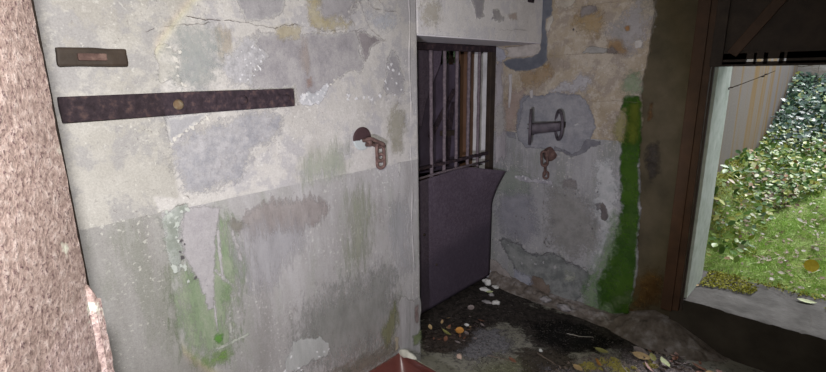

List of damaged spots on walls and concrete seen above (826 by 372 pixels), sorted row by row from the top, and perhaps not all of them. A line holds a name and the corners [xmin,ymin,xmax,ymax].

peeling [161,204,197,283]
leakage [231,194,327,288]
spalling [490,230,590,301]
leakage [547,157,633,314]
peeling [284,336,330,372]